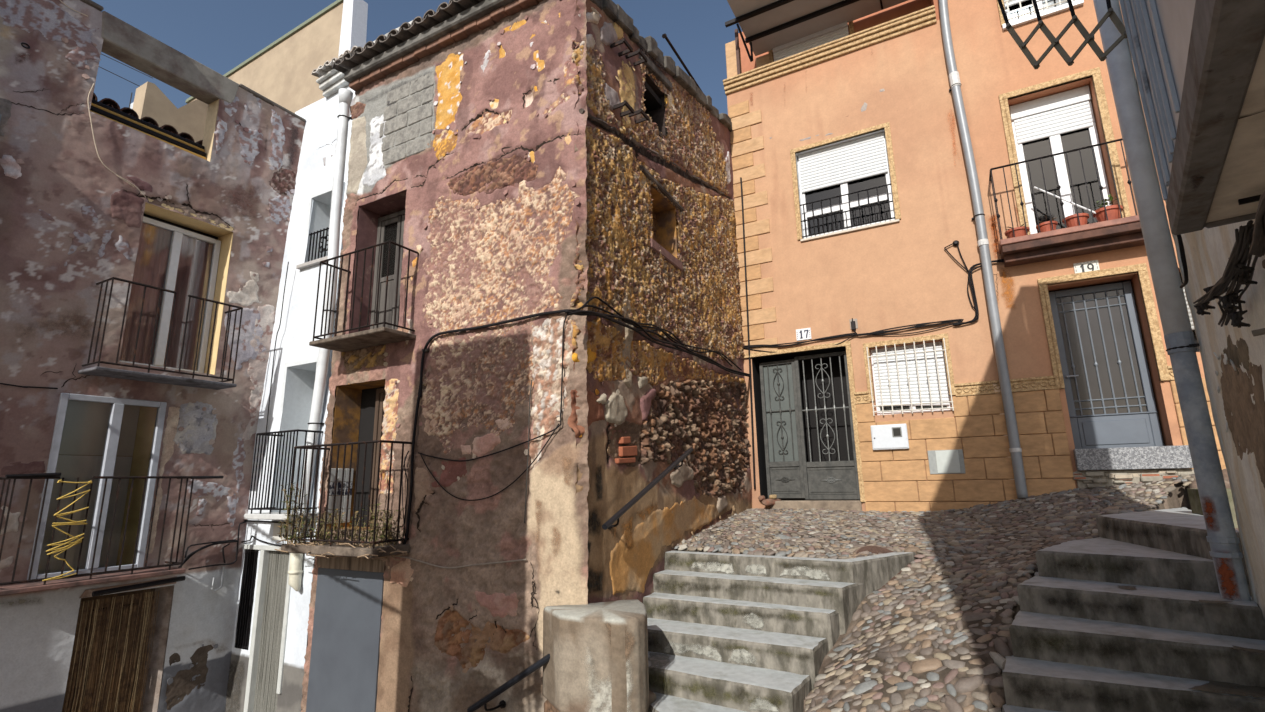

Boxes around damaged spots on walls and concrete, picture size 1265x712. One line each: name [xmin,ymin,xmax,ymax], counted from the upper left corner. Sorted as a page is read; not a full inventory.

peeling [0,155,24,179]
crack [11,88,84,115]
peeling [214,96,296,225]
peeling [349,97,386,189]
peeling [64,176,233,267]
flaking render [405,7,751,596]
flaking render [341,344,400,494]
peeling [1213,335,1265,488]
rust [1203,498,1215,528]
rust [1217,558,1239,600]
flaking render [165,644,218,710]
flaking render [434,591,530,673]